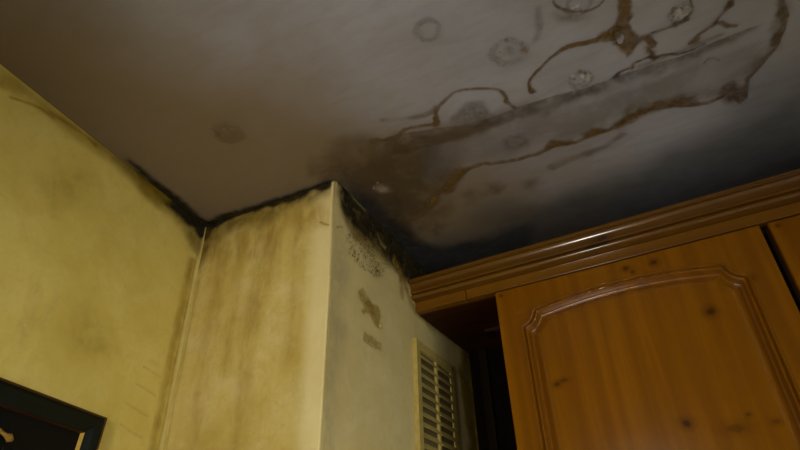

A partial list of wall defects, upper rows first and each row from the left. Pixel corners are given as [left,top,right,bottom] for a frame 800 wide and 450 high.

leakage [528,0,657,93]
leakage [688,0,737,45]
leakage [715,0,789,103]
leakage [117,88,800,280]
peeling [359,288,381,329]